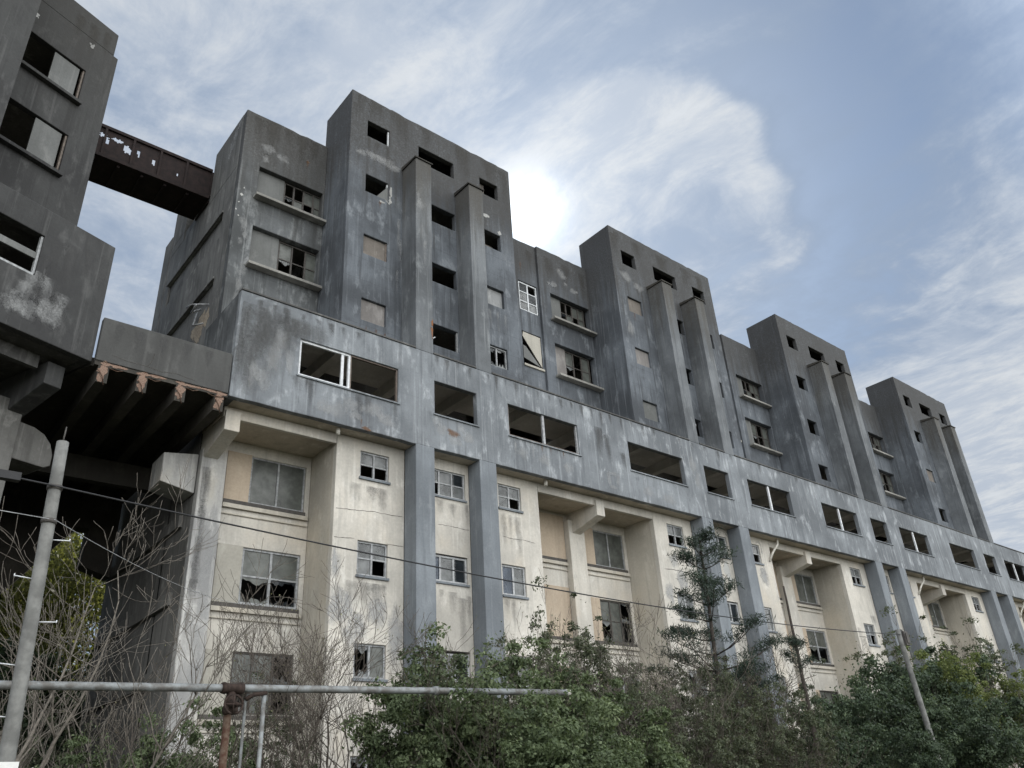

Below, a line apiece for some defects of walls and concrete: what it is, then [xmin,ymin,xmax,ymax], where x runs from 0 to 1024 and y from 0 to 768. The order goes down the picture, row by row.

spalling [96,361,227,410]